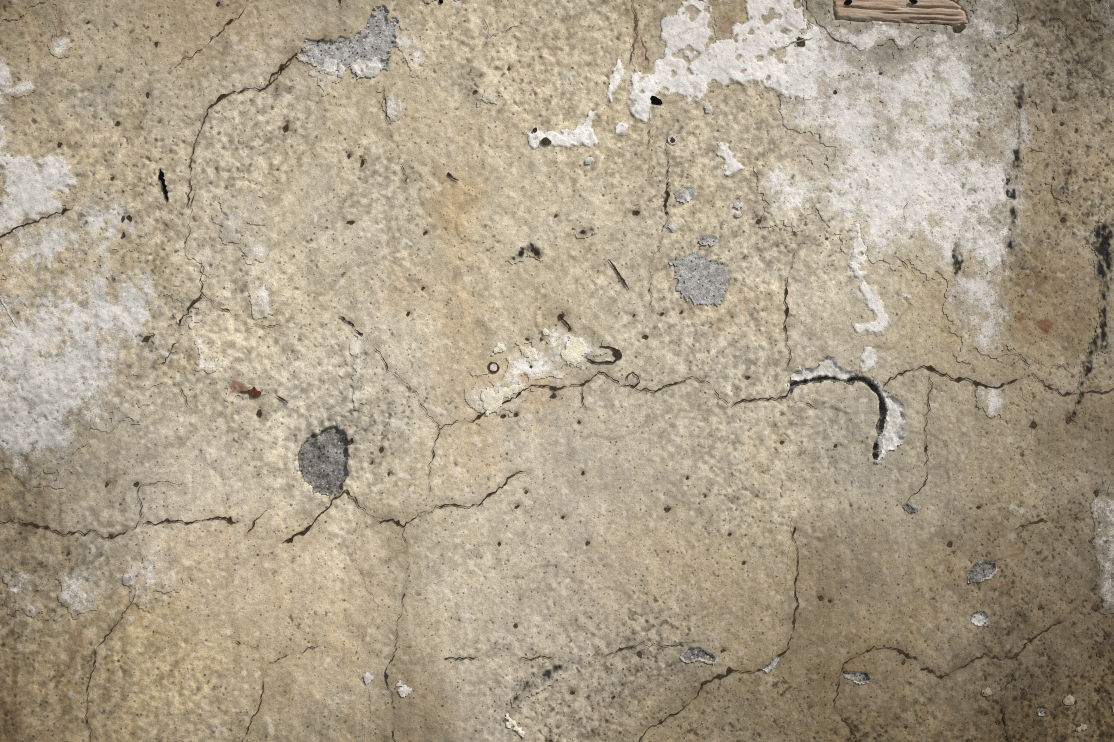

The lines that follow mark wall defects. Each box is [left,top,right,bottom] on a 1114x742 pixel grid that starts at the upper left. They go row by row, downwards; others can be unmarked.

spalling [296,5,399,96]
peeling [382,95,408,121]
crack [151,38,324,407]
spalling [669,236,731,314]
crack [0,481,266,539]
spalling [298,427,354,497]
crack [281,253,818,742]
spalling [787,345,906,463]
leakage [771,81,1114,742]
crack [884,353,1114,499]
leakage [0,683,70,742]
crack [834,620,1065,742]